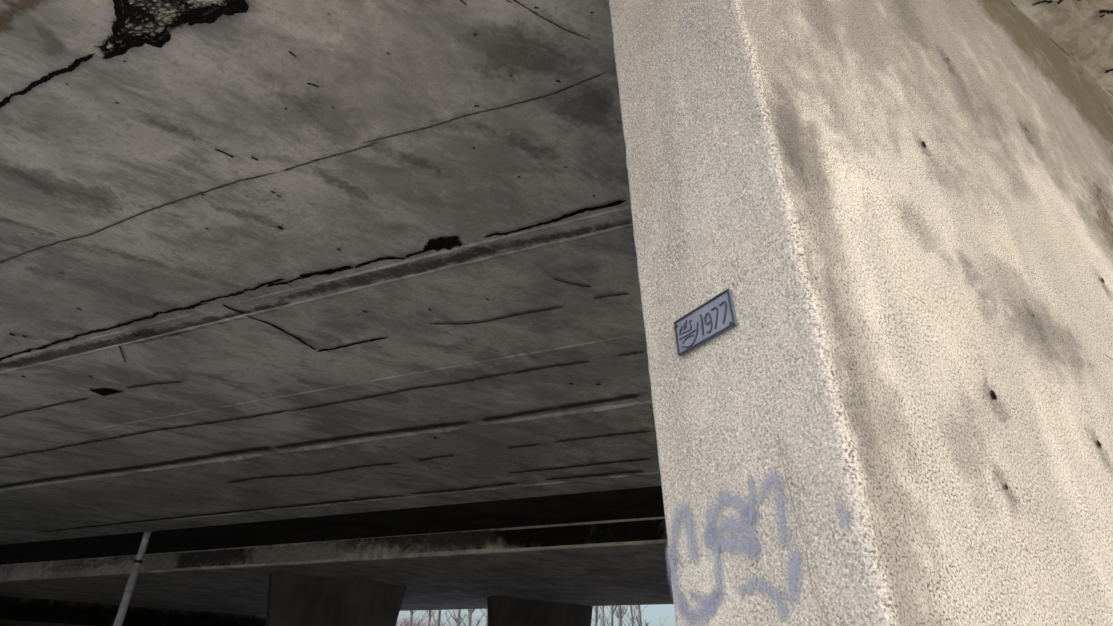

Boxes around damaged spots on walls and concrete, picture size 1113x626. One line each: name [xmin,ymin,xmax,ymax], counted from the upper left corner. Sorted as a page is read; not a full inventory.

spalling [93,0,249,62]
crack [0,53,96,108]
crack [0,71,626,263]
crack [0,245,443,388]
leakage [0,596,266,626]